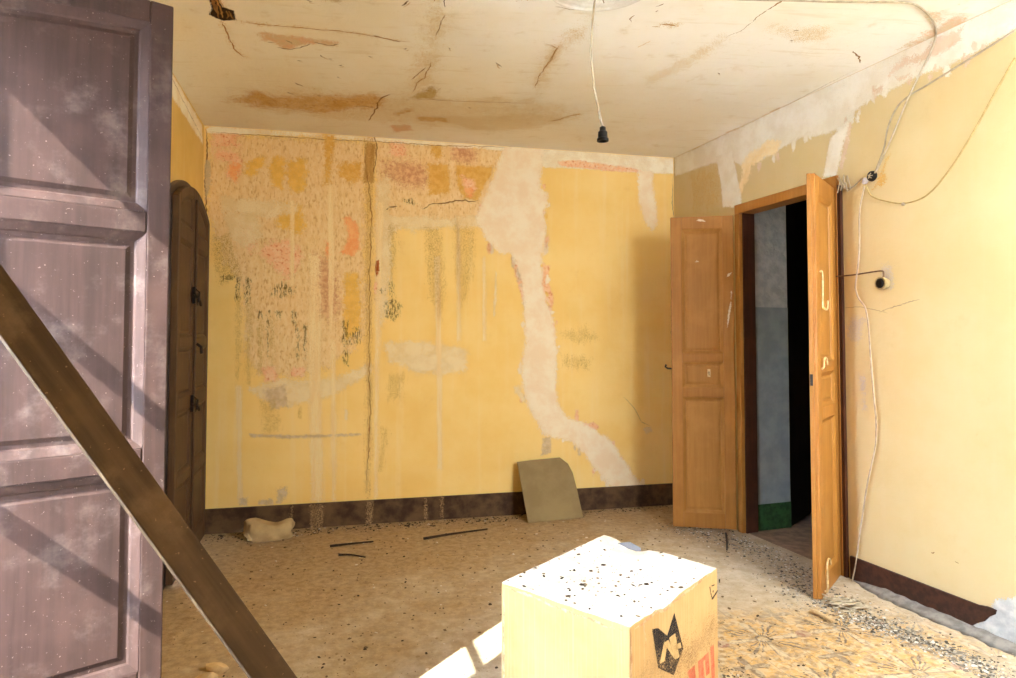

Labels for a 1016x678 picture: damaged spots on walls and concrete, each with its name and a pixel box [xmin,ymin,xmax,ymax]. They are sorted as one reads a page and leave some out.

crack [218,18,405,59]
damp [220,0,597,134]
crack [366,44,562,120]
peeling [541,0,1016,177]
peeling [172,73,504,381]
damp [210,137,408,528]
damp [421,215,497,470]
flaking render [974,596,1016,643]